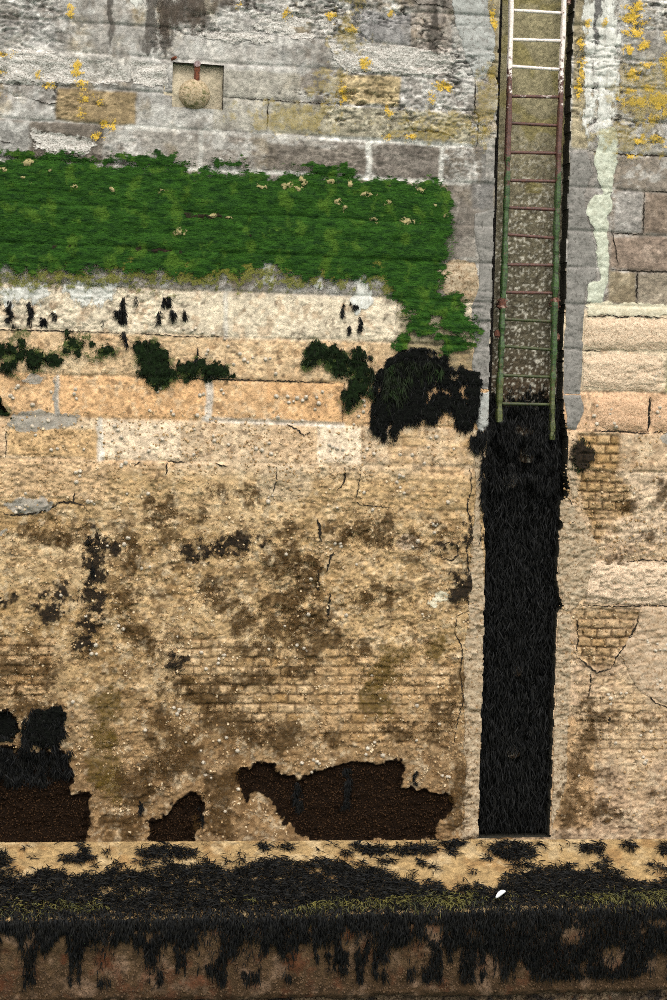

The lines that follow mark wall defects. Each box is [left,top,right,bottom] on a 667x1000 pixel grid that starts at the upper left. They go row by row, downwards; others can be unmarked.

water stain [107,0,115,41]
water stain [130,0,233,56]
water stain [427,0,445,51]
peeling [231,455,486,841]
crack [575,587,667,696]
peeling [0,708,92,843]
peeling [147,791,205,842]